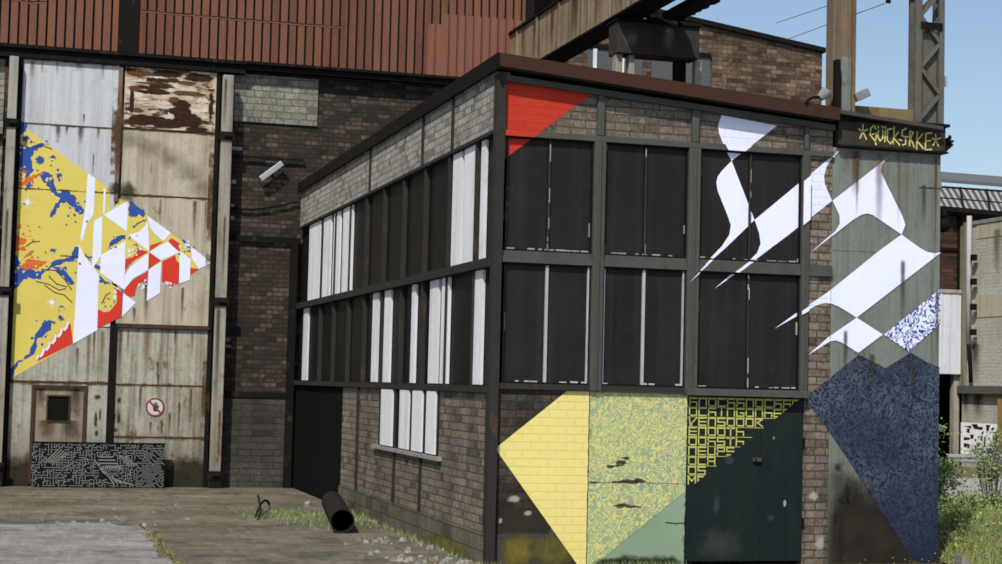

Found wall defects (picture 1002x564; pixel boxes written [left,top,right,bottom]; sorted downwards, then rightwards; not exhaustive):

peeling [124,67,215,133]
flaking render [606,456,629,468]
water stain [816,485,937,564]